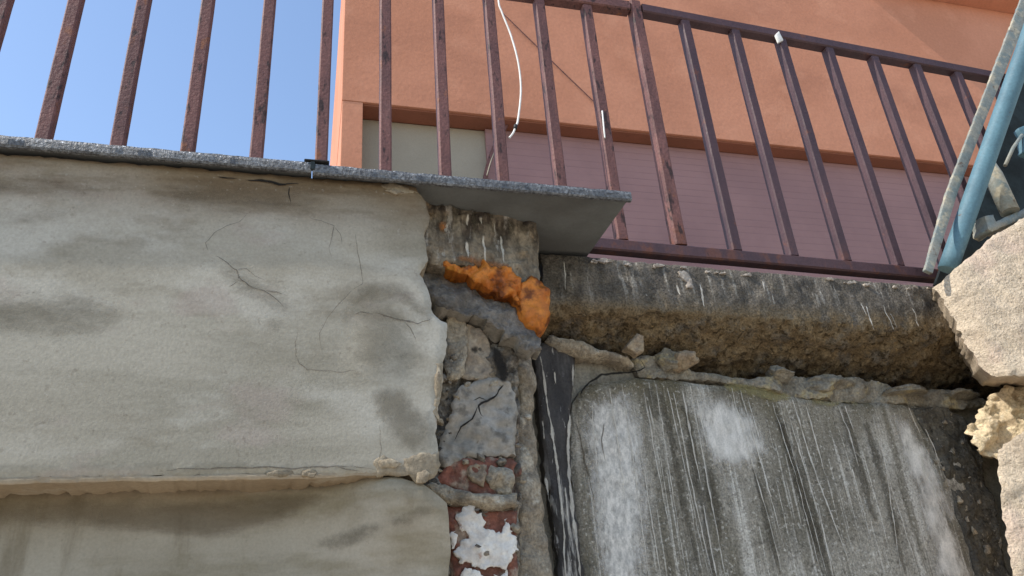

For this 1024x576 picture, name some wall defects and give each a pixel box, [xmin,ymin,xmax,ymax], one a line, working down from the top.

crack [221,177,298,202]
crack [205,221,282,300]
crack [295,305,430,373]
spalling [678,266,694,289]
crack [455,385,503,439]
peeling [450,505,518,576]
damp [540,357,581,576]
damp [584,386,784,576]
damp [773,399,847,576]
damp [838,406,873,546]
damp [899,408,969,576]
spalling [909,406,1011,576]